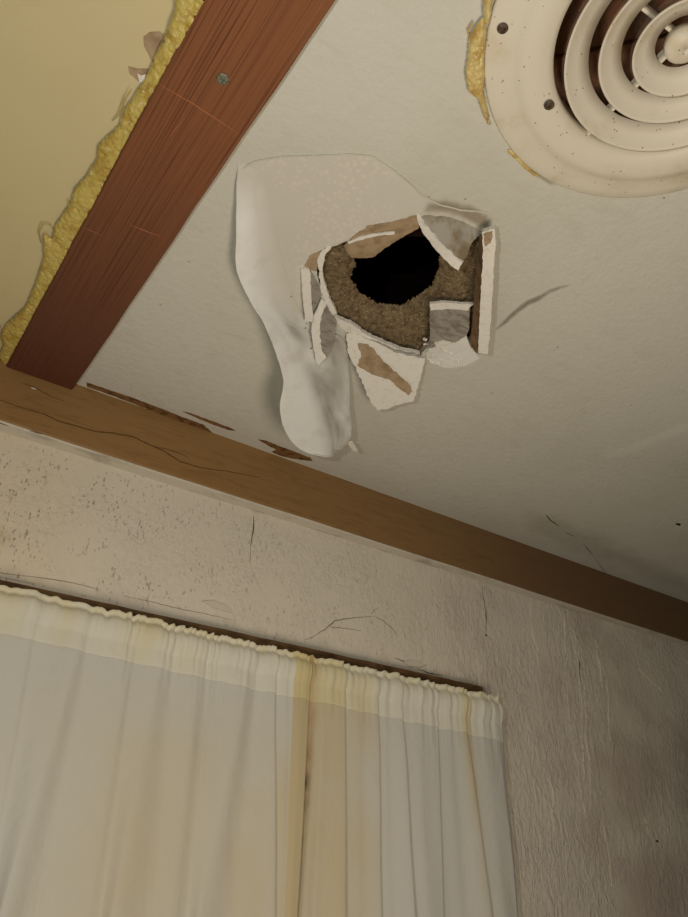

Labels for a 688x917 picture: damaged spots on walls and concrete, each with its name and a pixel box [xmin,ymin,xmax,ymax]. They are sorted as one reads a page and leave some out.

peeling [235,153,487,461]
crack [0,383,257,477]
peeling [87,382,235,433]
crack [305,608,396,640]